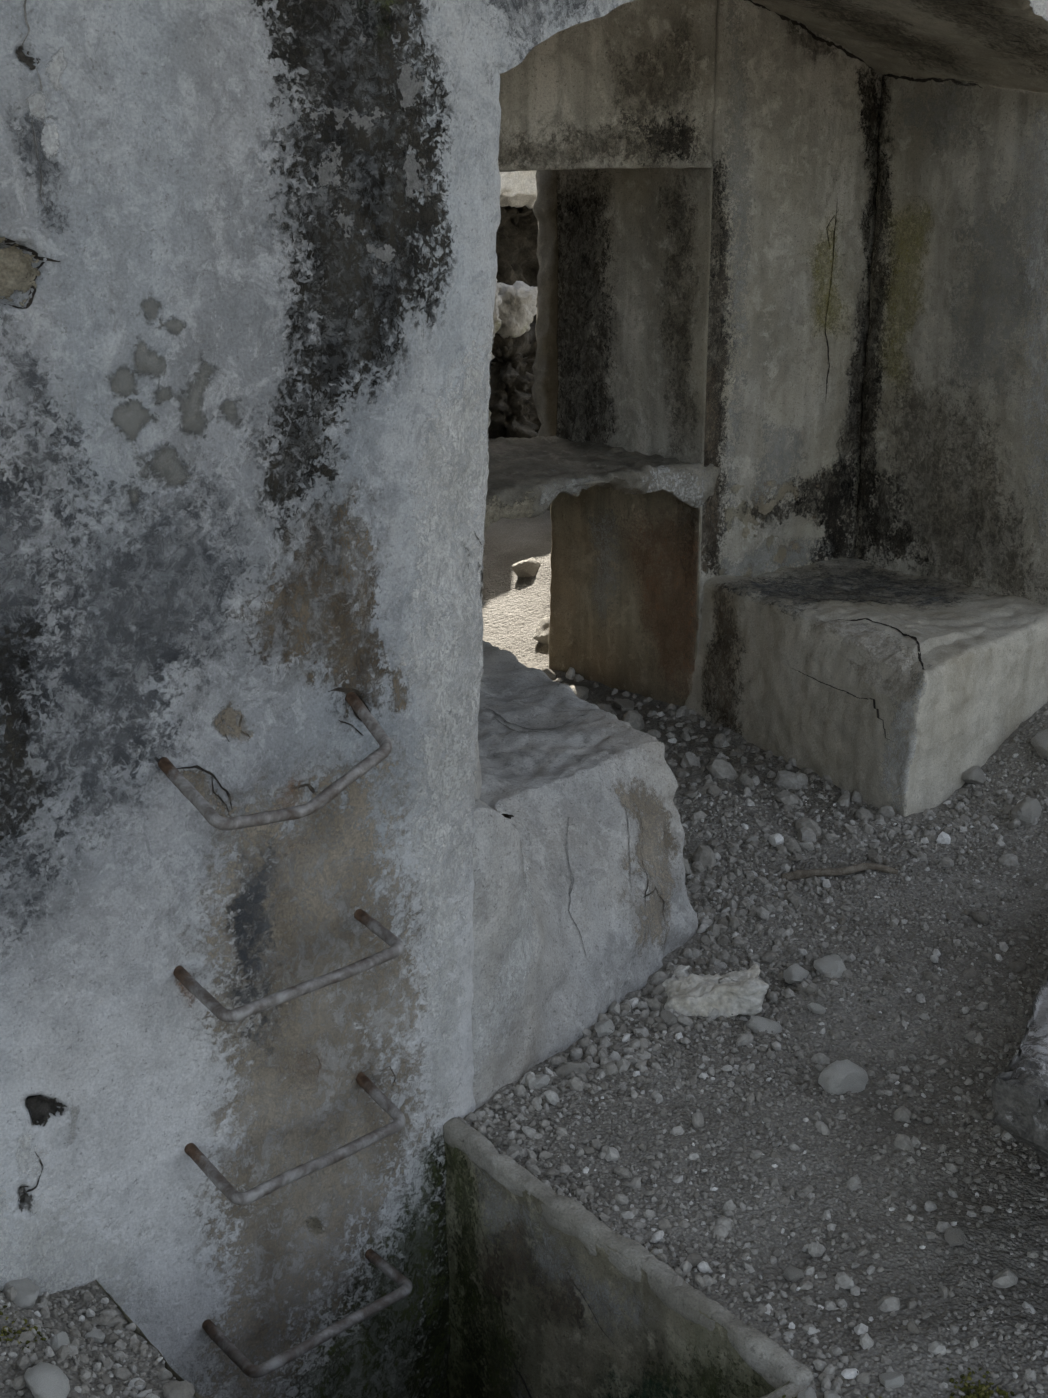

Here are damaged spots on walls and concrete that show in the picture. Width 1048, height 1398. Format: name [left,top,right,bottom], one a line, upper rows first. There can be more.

crack [744,0,982,130]
spalling [0,237,60,309]
water stain [487,0,1048,621]
water stain [0,0,453,948]
spalling [16,1095,80,1214]